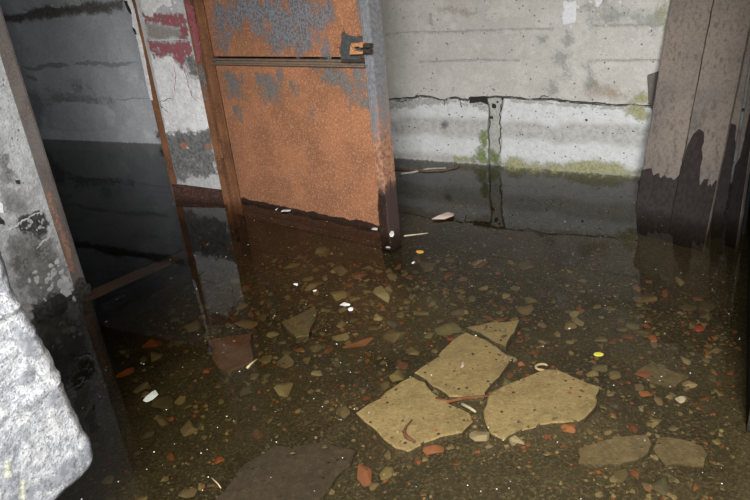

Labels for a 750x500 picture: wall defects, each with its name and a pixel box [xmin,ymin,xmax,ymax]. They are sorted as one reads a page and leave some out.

peeling [124,0,209,150]
crack [392,94,469,107]
crack [487,95,636,153]
spalling [18,210,49,240]